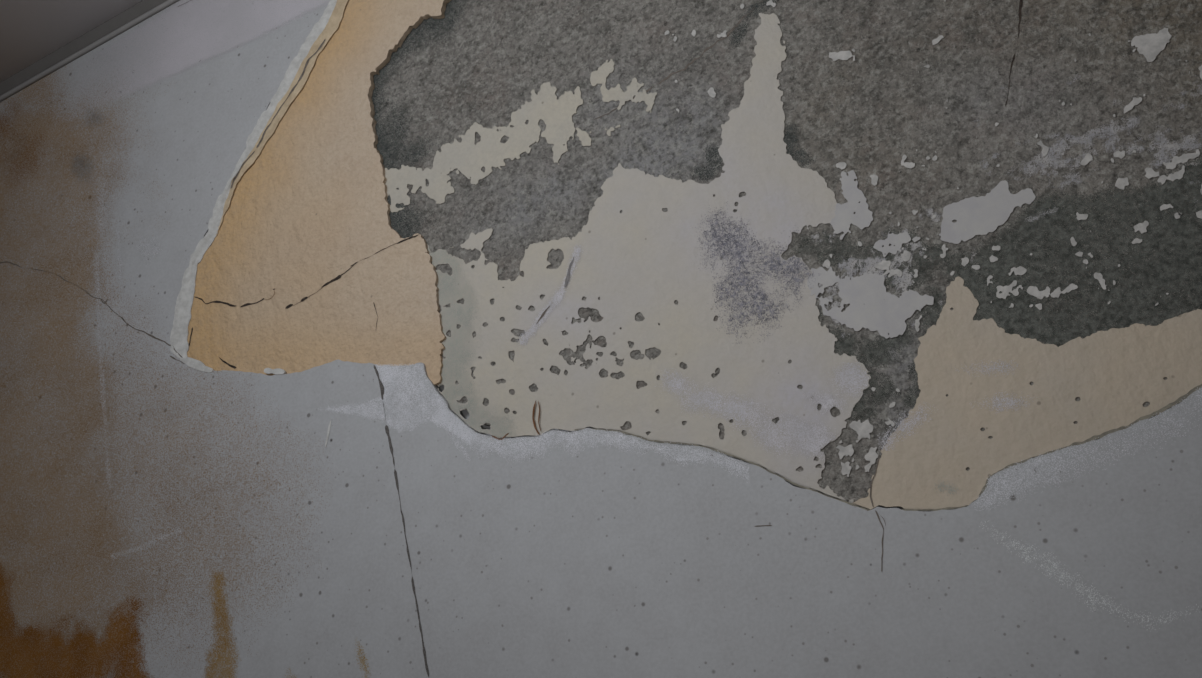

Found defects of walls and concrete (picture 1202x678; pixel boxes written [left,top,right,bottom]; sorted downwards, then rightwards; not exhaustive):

water stain [728,0,779,49]
crack [1005,0,1023,107]
crack [0,234,419,364]
spalling [170,0,1202,511]
water stain [655,99,1202,461]
crack [374,365,429,677]
rust [204,569,240,678]